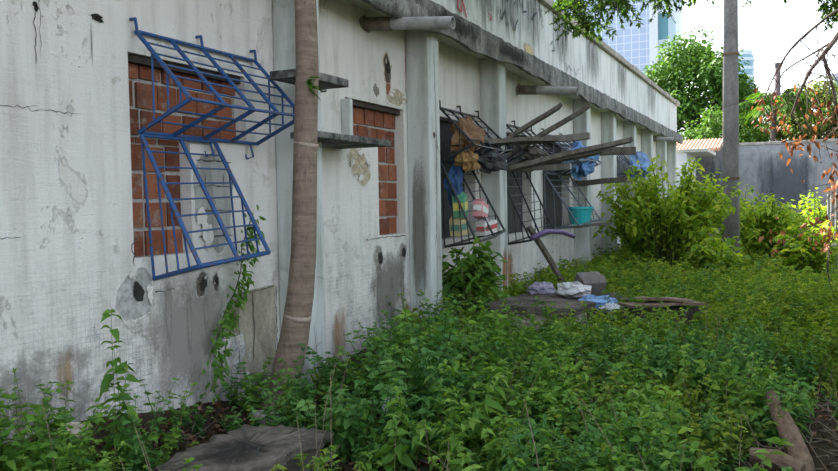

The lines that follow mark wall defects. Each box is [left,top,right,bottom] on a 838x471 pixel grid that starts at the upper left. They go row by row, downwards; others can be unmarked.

crack [33,0,42,58]
spalling [89,12,104,24]
crack [0,105,75,114]
spalling [113,237,174,324]
spalling [195,270,219,298]